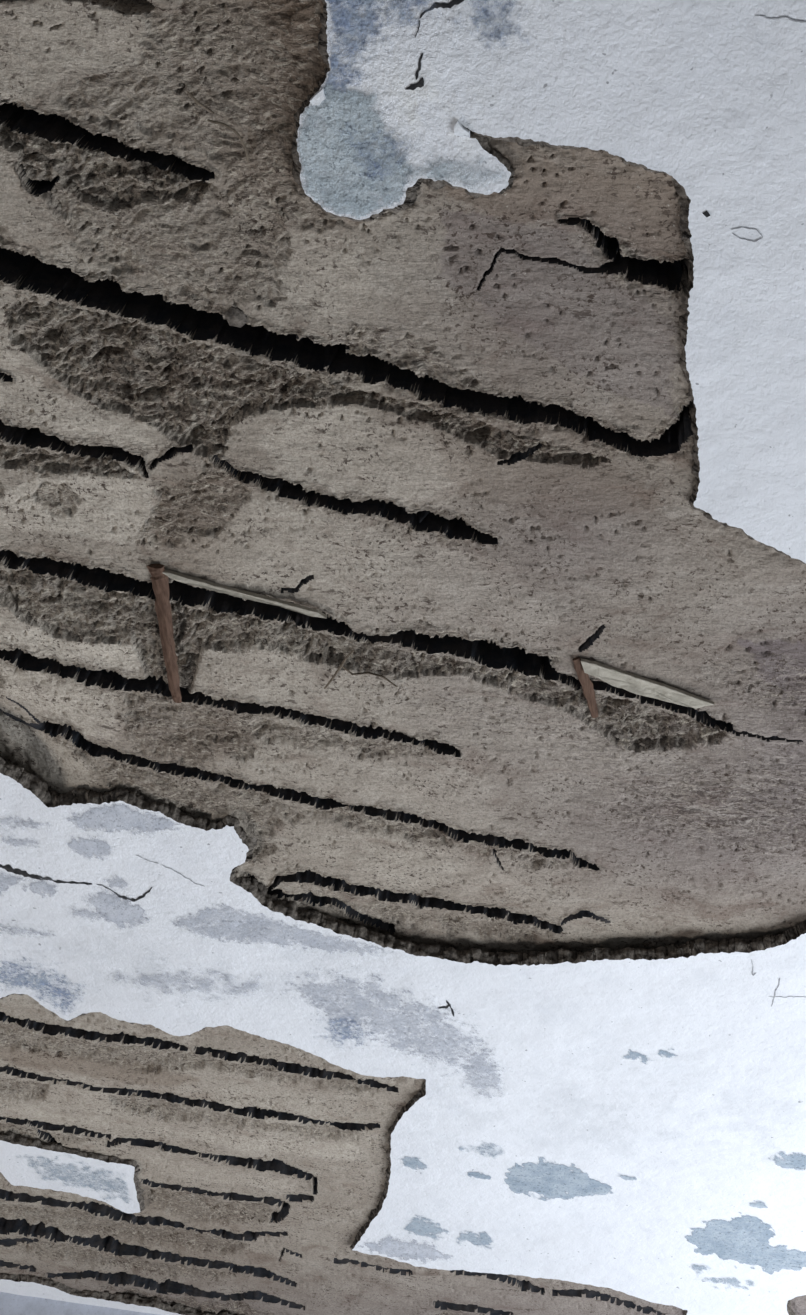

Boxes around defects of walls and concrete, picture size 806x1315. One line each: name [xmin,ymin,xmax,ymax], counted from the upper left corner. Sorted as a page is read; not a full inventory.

crack [405,0,464,90]
damp [297,0,498,219]
spalling [0,0,806,966]
damp [68,805,178,859]
crack [0,855,205,902]
damp [72,877,149,928]
damp [173,904,384,954]
damp [286,974,500,1098]
spalling [0,993,688,1315]
peeling [774,1152,806,1170]
peeling [685,1202,806,1288]
spalling [787,1295,806,1315]